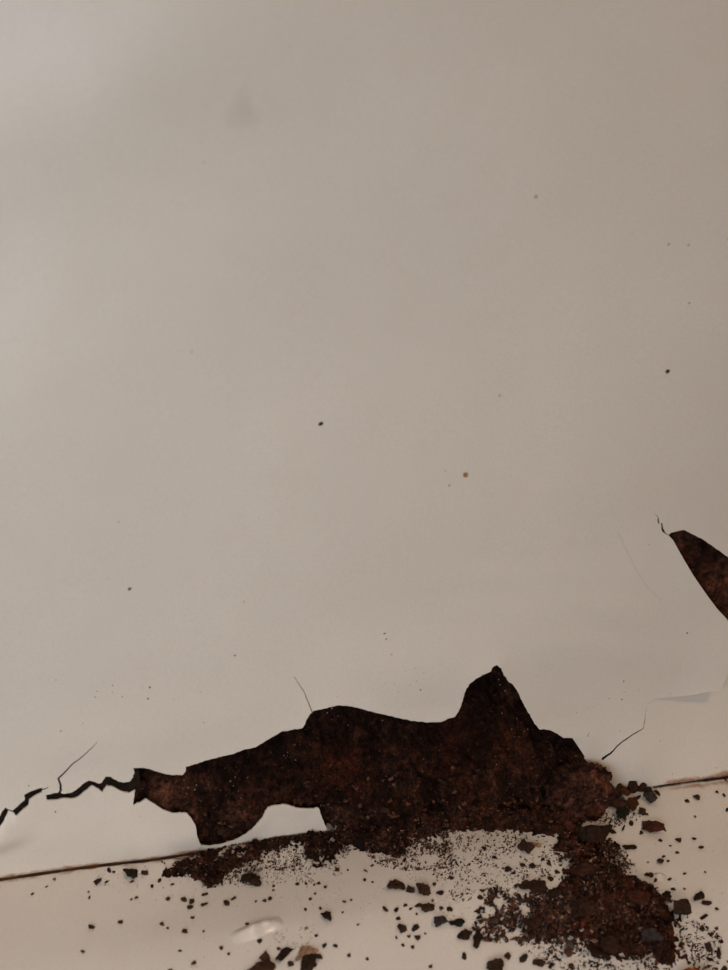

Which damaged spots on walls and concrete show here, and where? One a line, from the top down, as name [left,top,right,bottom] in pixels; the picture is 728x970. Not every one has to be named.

peeling [133,530,728,845]
crack [602,715,646,760]
crack [0,742,141,825]